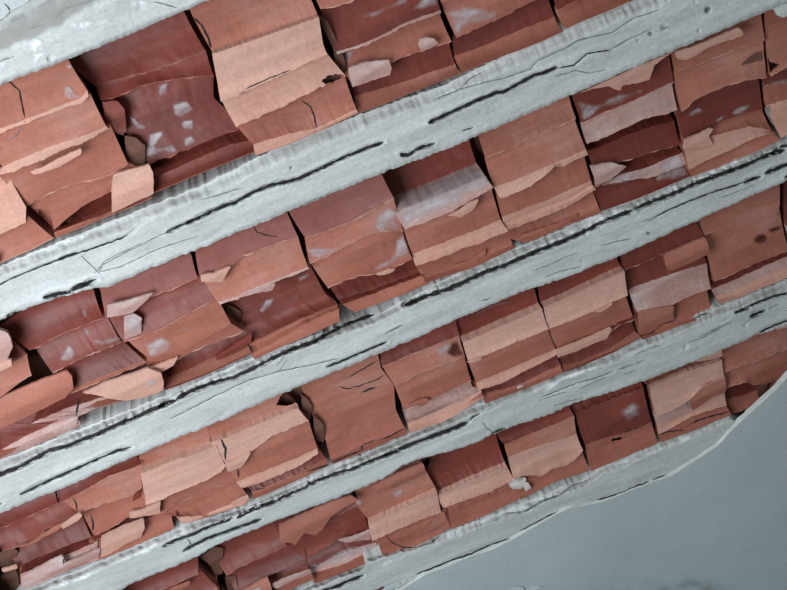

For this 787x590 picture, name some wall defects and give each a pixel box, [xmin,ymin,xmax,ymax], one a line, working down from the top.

crack [429,10,658,123]
peeling [577,27,743,95]
peeling [101,133,162,229]
crack [0,142,383,297]
crack [404,144,787,306]
peeling [83,356,178,401]
crack [0,314,402,477]
peeling [555,327,612,357]
crack [21,447,132,530]
peeling [100,500,219,562]
crack [164,414,506,551]
flaking render [394,371,787,590]